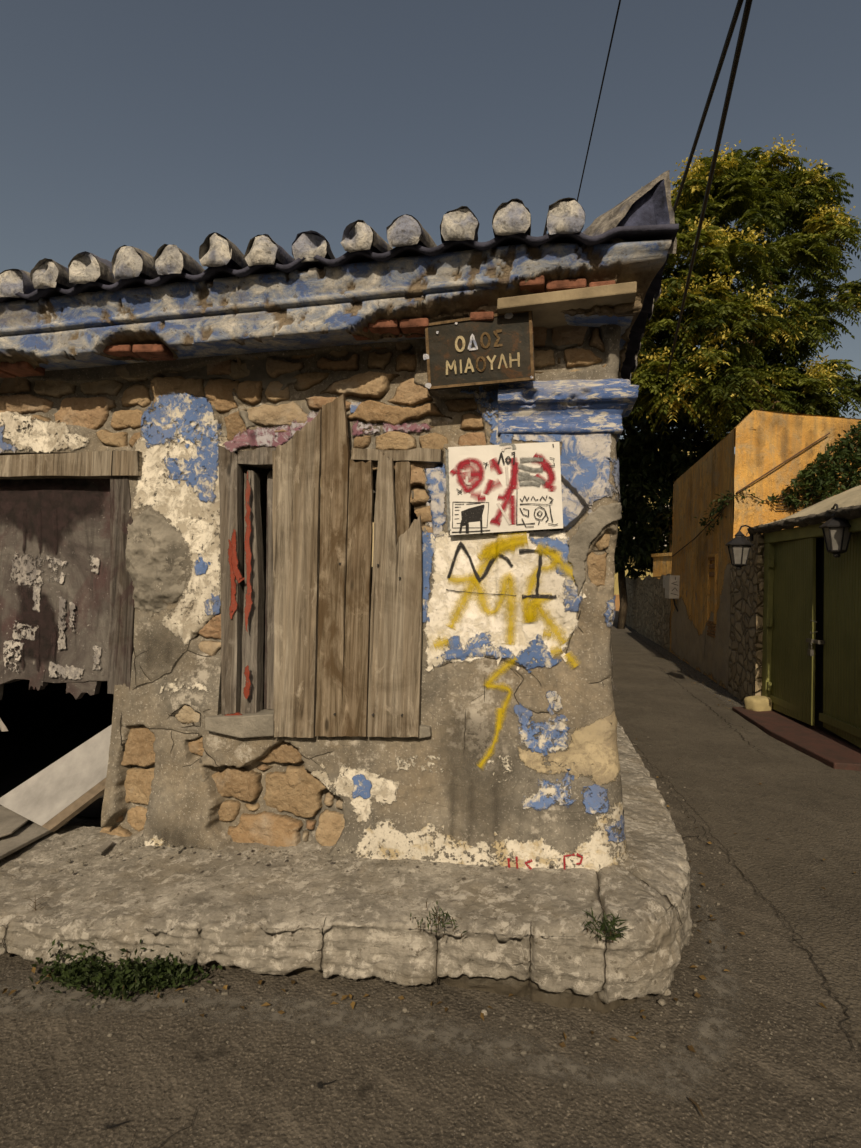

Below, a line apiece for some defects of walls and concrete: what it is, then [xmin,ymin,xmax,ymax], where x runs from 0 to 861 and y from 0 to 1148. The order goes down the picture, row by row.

peeling [0,342,620,682]
flaking render [100,725,173,848]
peeling [159,676,208,699]
flaking render [175,705,204,724]
flaking render [188,737,444,847]
flaking render [485,691,626,843]
crack [596,872,618,997]
crack [642,761,861,1059]